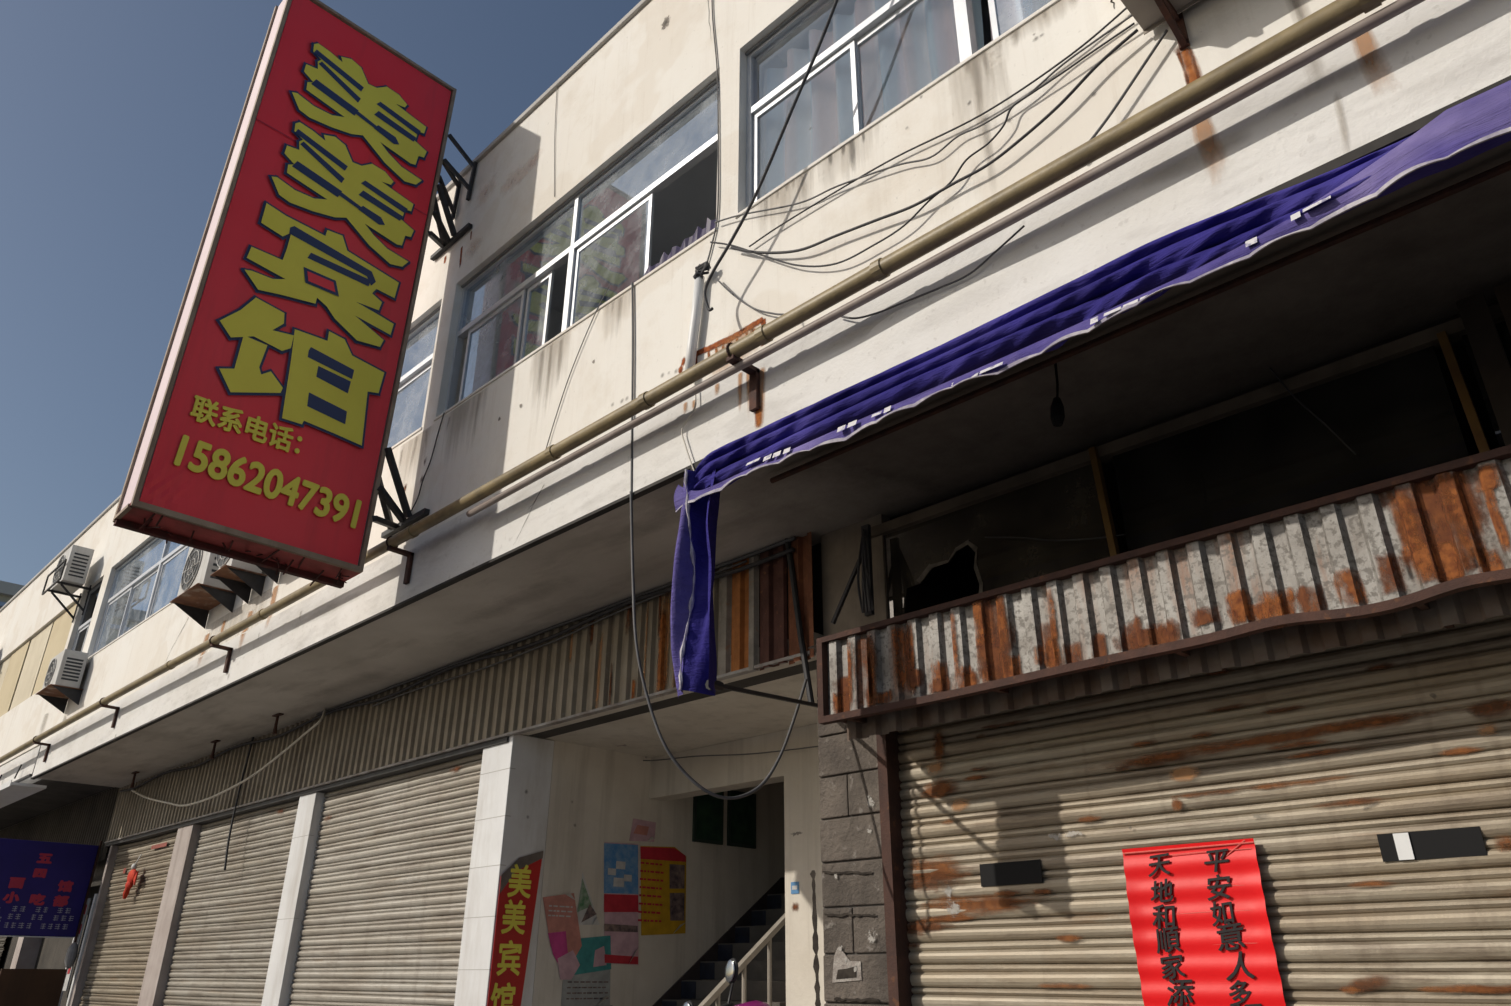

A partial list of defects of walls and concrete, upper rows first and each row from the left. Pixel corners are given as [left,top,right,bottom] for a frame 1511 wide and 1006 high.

corrosion [1176,47,1200,84]
corrosion [678,317,766,373]
corrosion [738,369,764,426]
corrosion [1377,464,1509,593]
corrosion [1193,569,1365,627]
corrosion [626,595,676,699]
corrosion [833,590,1179,714]
corrosion [1442,700,1511,755]
corrosion [1116,715,1408,809]
corrosion [906,860,1051,947]
corrosion [1340,976,1386,993]
corrosion [1422,985,1511,993]